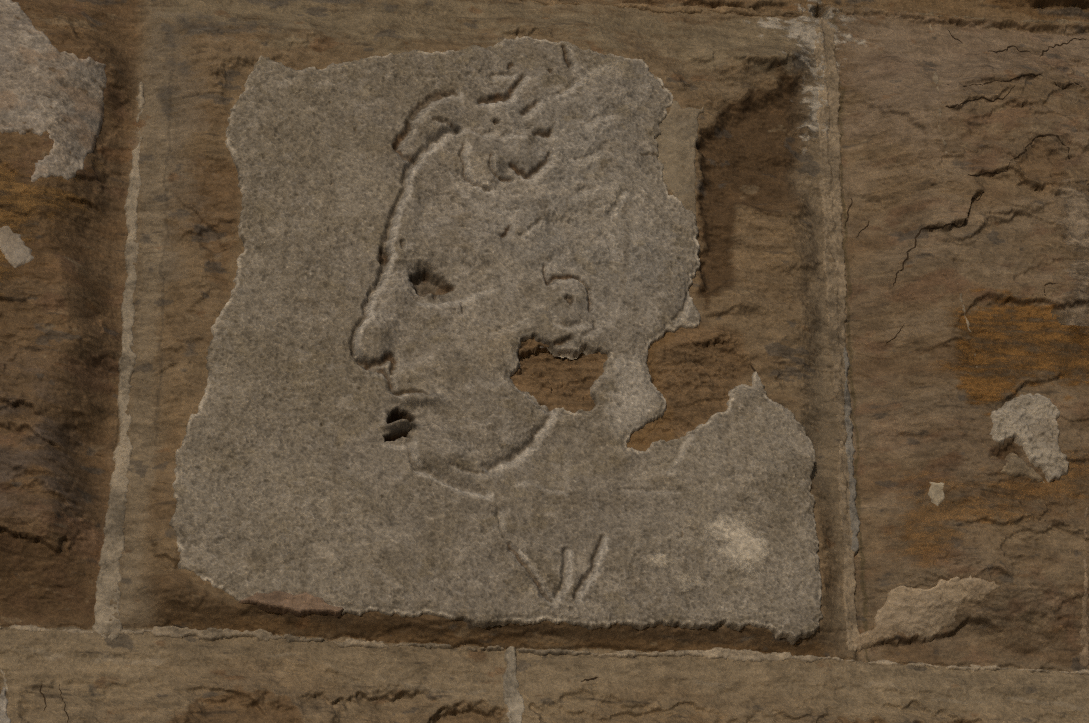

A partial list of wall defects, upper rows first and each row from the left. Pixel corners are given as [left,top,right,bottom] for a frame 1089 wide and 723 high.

crack [946,38,1088,108]
spalling [627,69,813,451]
crack [893,134,1070,286]
spalling [510,337,608,413]